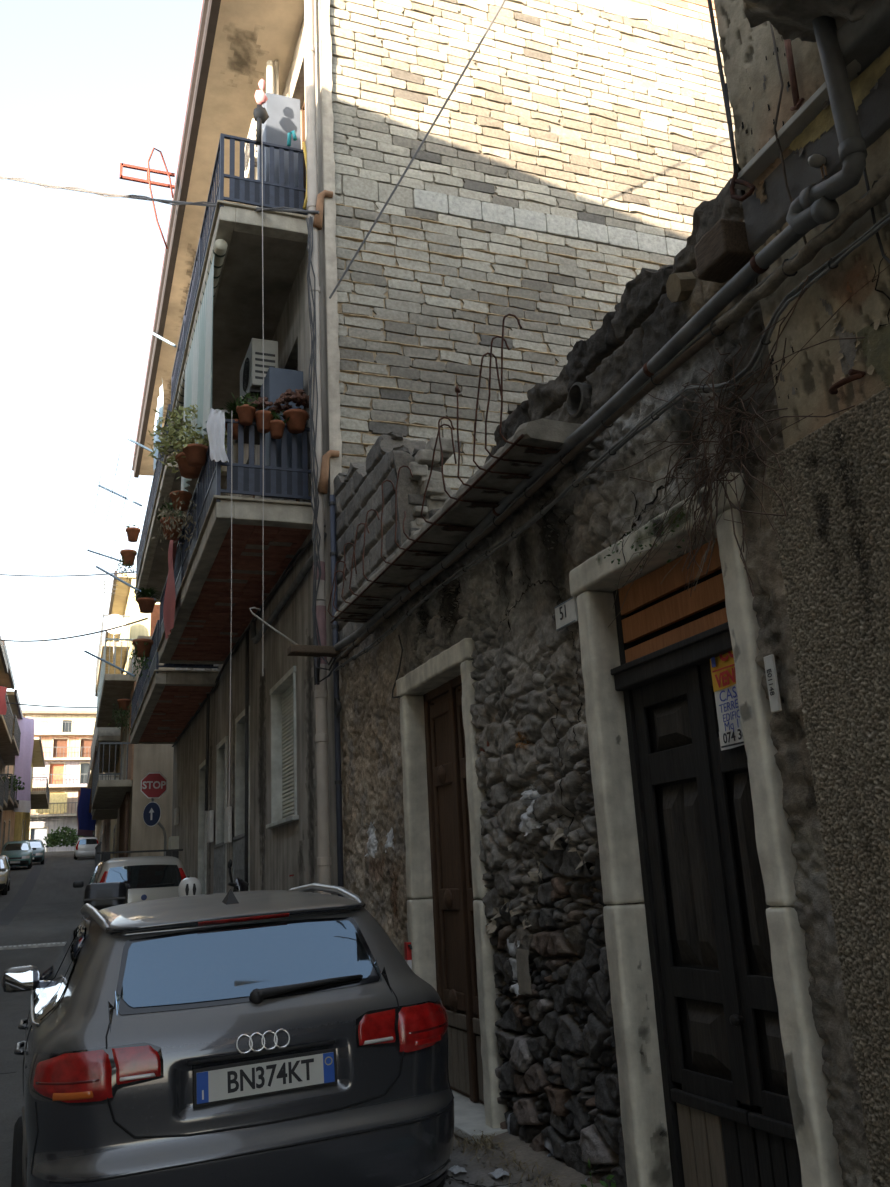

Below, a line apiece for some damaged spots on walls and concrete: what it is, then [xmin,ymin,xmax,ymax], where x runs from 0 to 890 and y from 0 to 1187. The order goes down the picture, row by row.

water stain [231,37,257,73]
spalling [407,437,455,537]
crack [619,412,716,564]
peeling [365,822,394,858]
peeling [519,784,586,870]
crack [446,1175,522,1187]